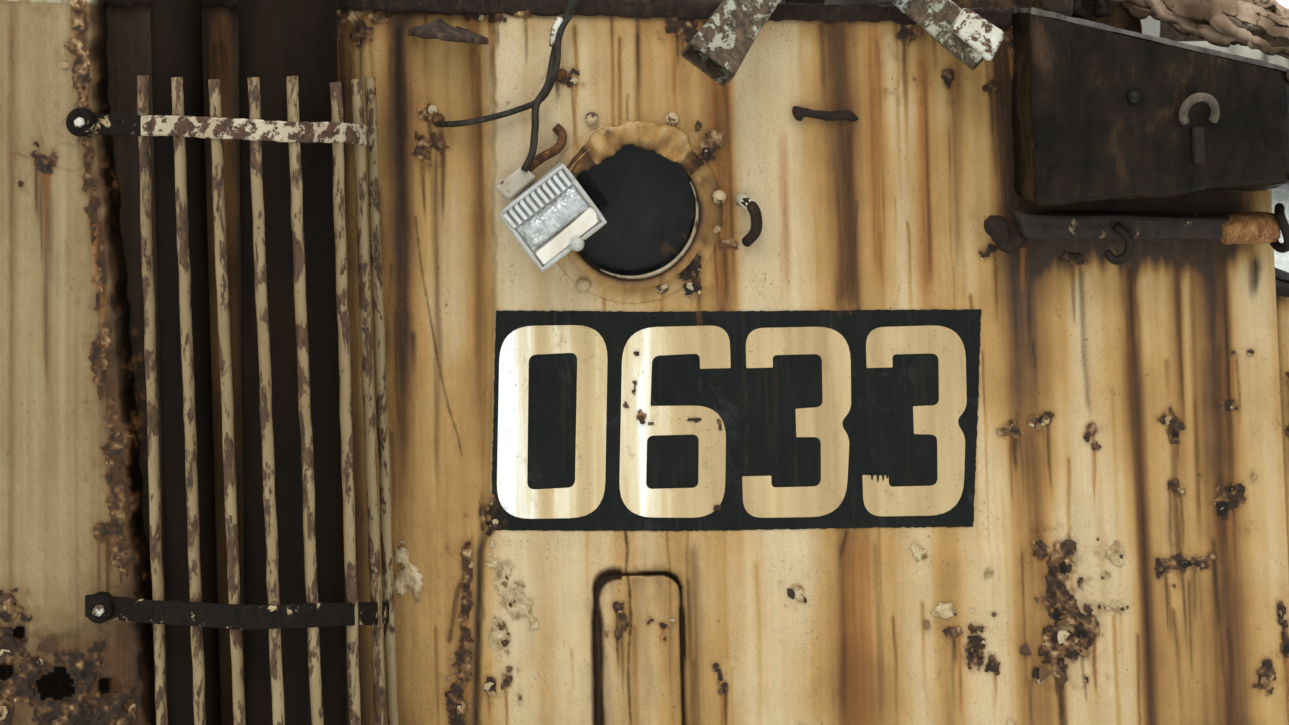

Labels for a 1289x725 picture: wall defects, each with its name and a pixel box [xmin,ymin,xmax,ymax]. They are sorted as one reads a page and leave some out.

rust [59,4,92,111]
rust [78,135,136,592]
rust [1126,263,1258,725]
rust [0,588,138,725]
peeling [393,540,423,603]
rust [445,541,522,725]
rust [942,623,1000,692]
rust [1020,539,1101,725]
rust [1253,601,1289,715]